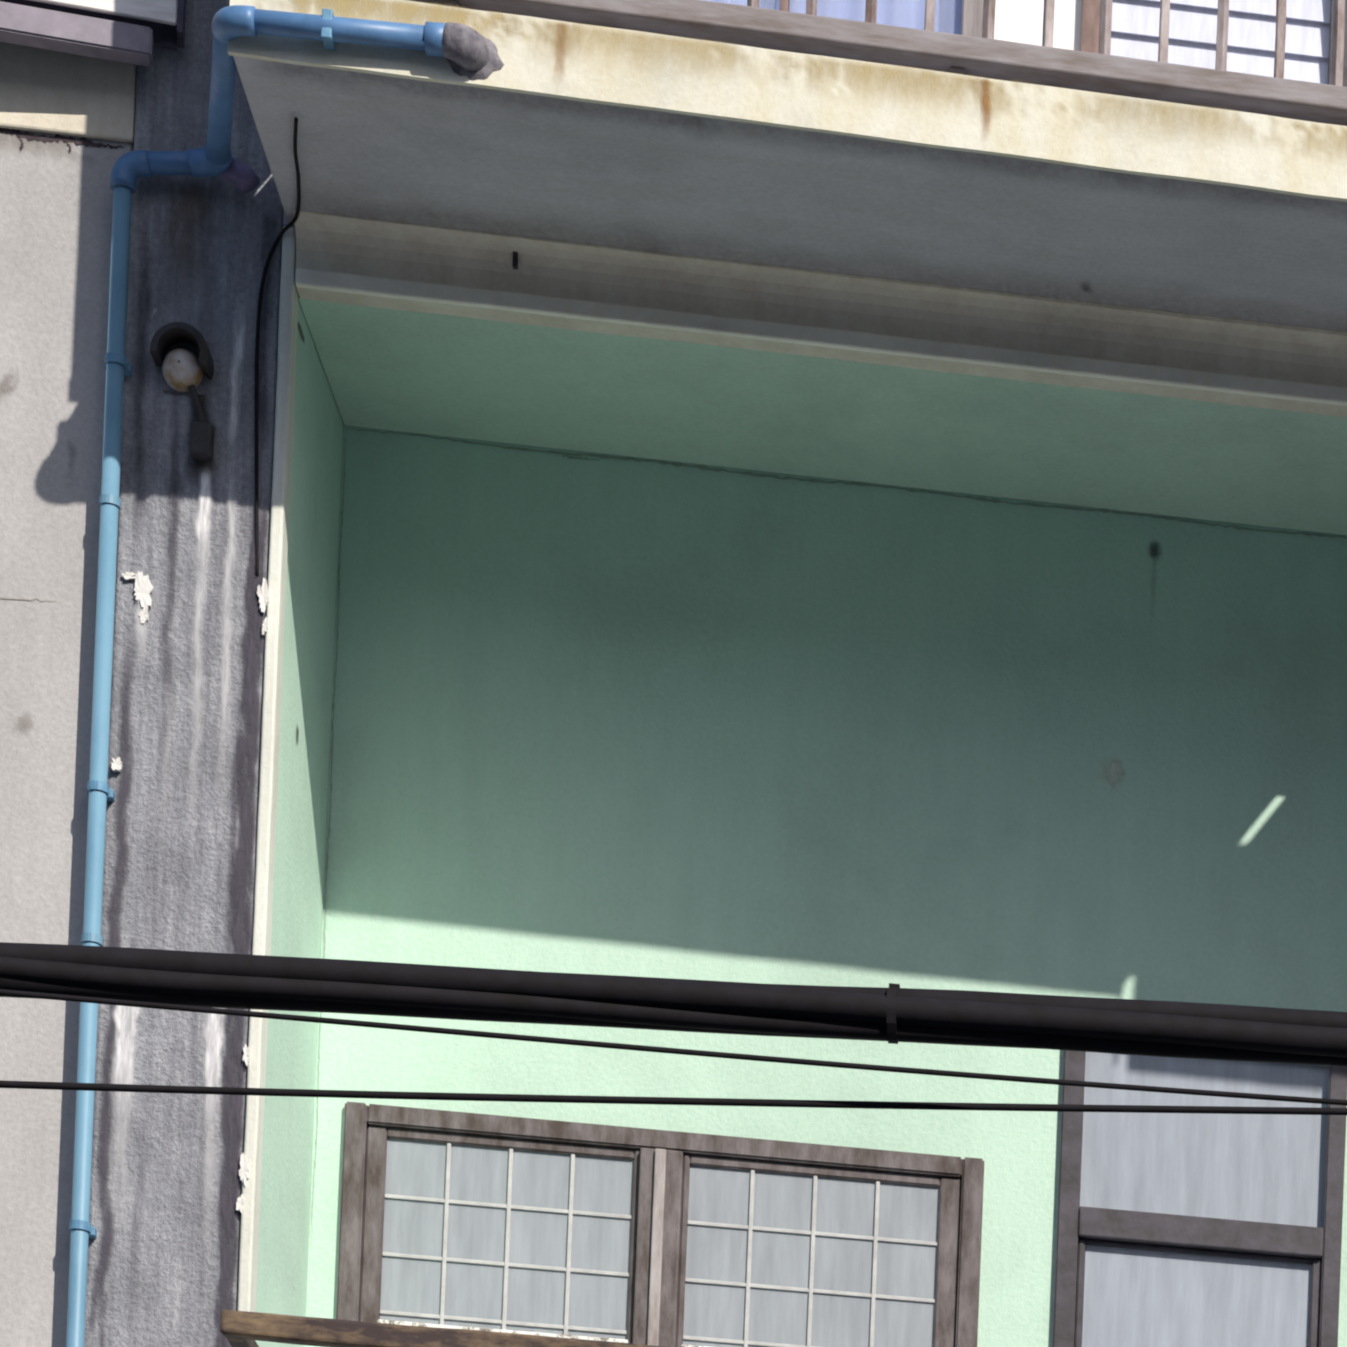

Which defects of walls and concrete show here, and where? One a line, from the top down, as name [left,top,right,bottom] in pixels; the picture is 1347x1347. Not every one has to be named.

water stain [110,684,130,947]
peeling [121,571,154,633]
water stain [188,457,215,552]
water stain [230,325,244,436]
water stain [232,512,267,955]
peeling [257,578,269,635]
water stain [94,1005,139,1302]
water stain [205,1008,246,1347]